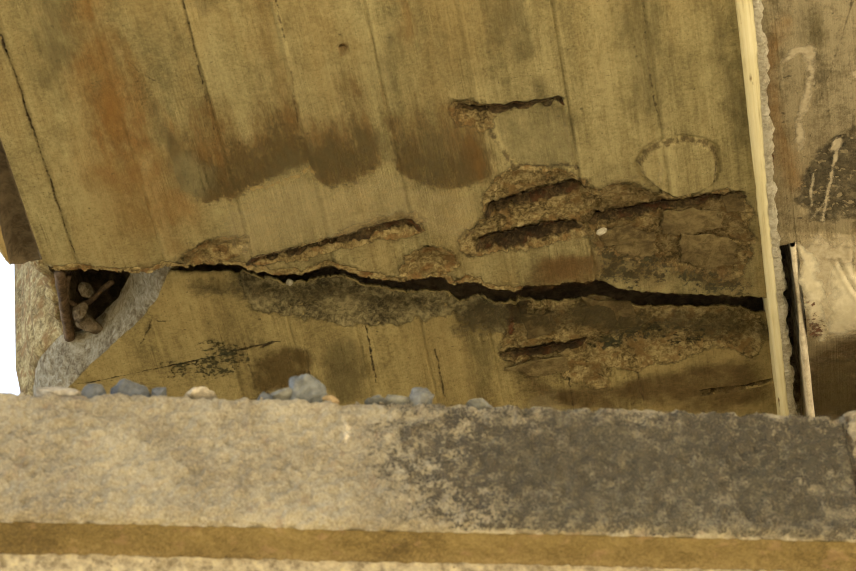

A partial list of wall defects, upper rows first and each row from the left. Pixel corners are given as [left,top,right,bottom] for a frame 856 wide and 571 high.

spalling [449,95,565,139]
water stain [171,109,380,203]
peeling [637,136,717,177]
spalling [48,151,764,389]
spalling [790,242,807,336]
water stain [254,348,312,397]
crack [845,416,856,493]